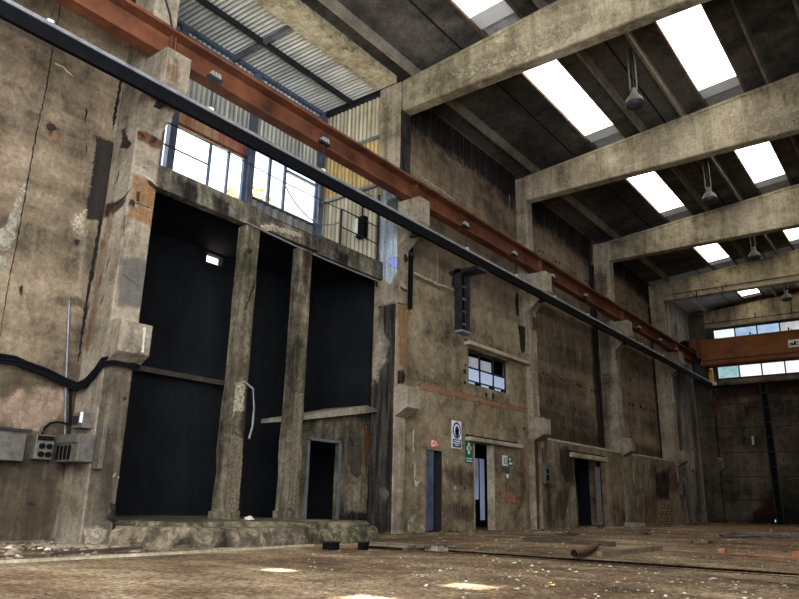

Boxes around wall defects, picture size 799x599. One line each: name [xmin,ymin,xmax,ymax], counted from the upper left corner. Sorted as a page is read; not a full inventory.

flaking render [0,183,28,267]
crack [0,46,54,336]